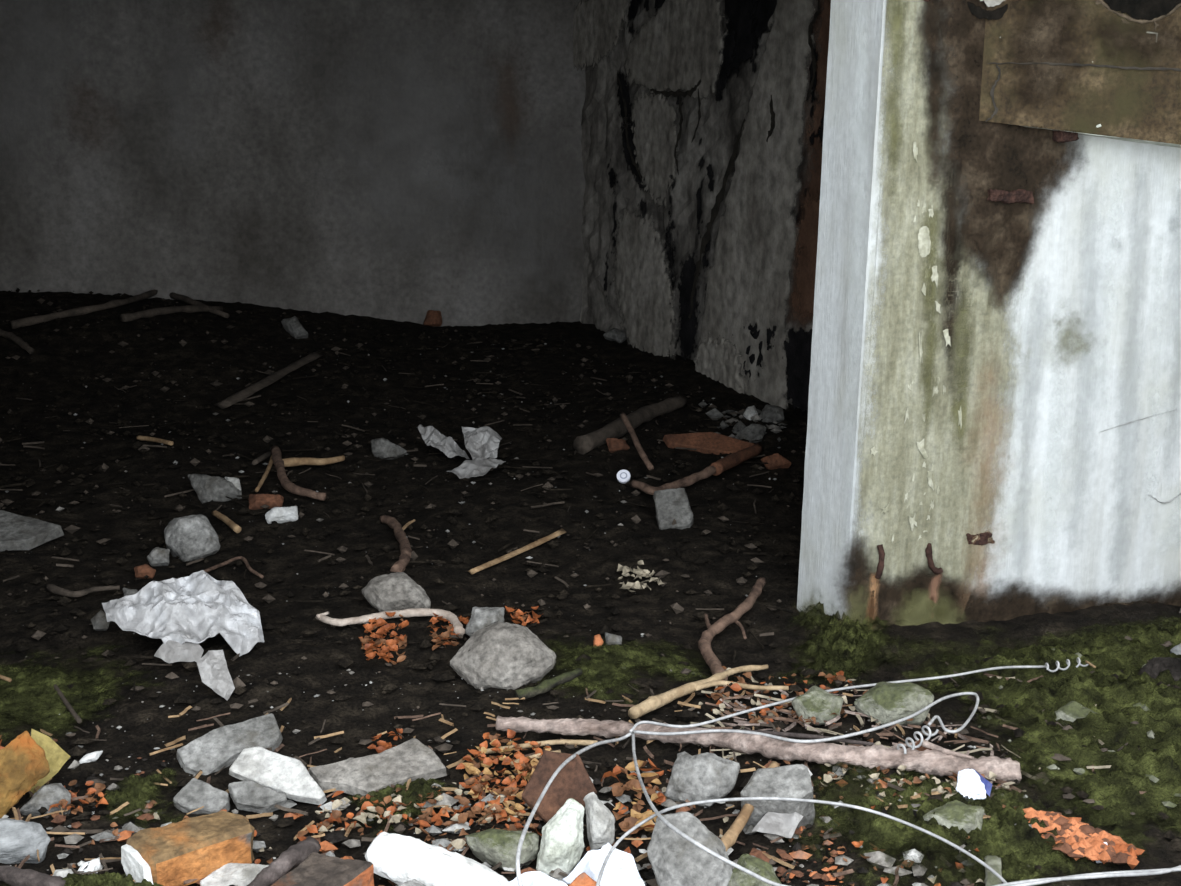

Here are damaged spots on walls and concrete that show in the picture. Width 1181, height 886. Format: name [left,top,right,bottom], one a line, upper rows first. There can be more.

leakage [891,0,903,69]
peeling [967,0,1008,20]
spalling [1095,0,1181,30]
leakage [887,91,900,163]
leakage [920,0,1181,437]
rust [966,530,995,546]
rust [867,575,877,630]
rust [929,573,942,603]